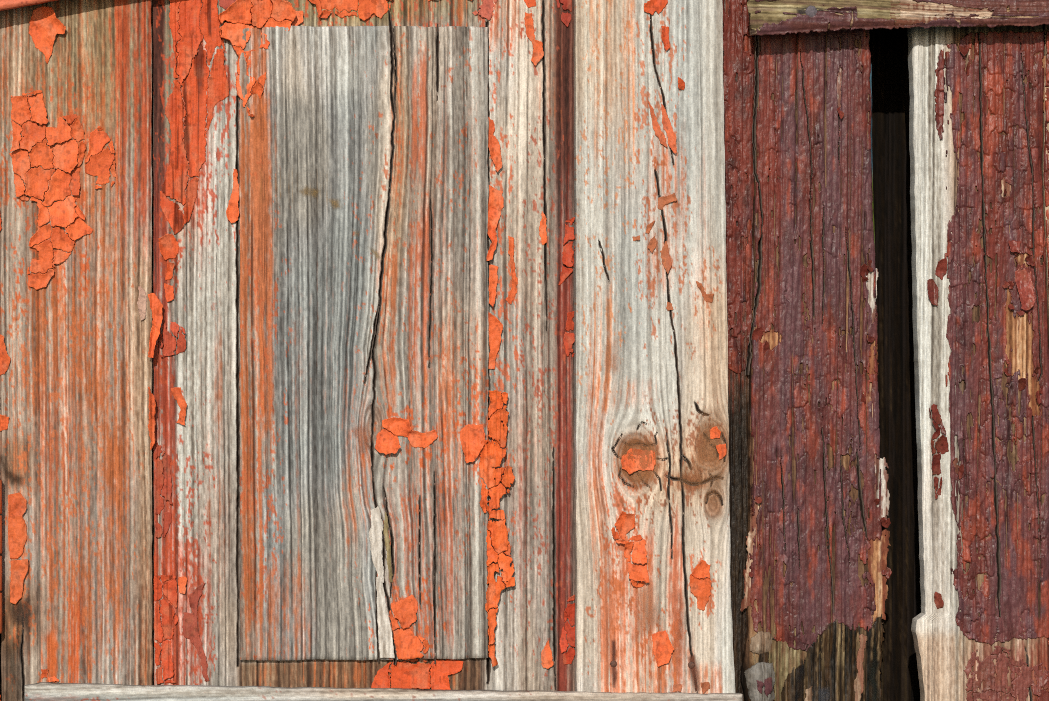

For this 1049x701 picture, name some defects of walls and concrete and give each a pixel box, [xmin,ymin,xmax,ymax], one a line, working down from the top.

peeling [9,90,118,290]
peeling [137,0,391,358]
crack [364,11,437,665]
peeling [371,594,463,690]
peeling [460,390,515,667]
crack [650,14,667,113]
crack [612,148,727,693]
crack [745,35,763,375]
crack [780,457,800,567]
crack [800,51,868,613]
peeling [866,455,892,622]
peeling [929,404,964,499]